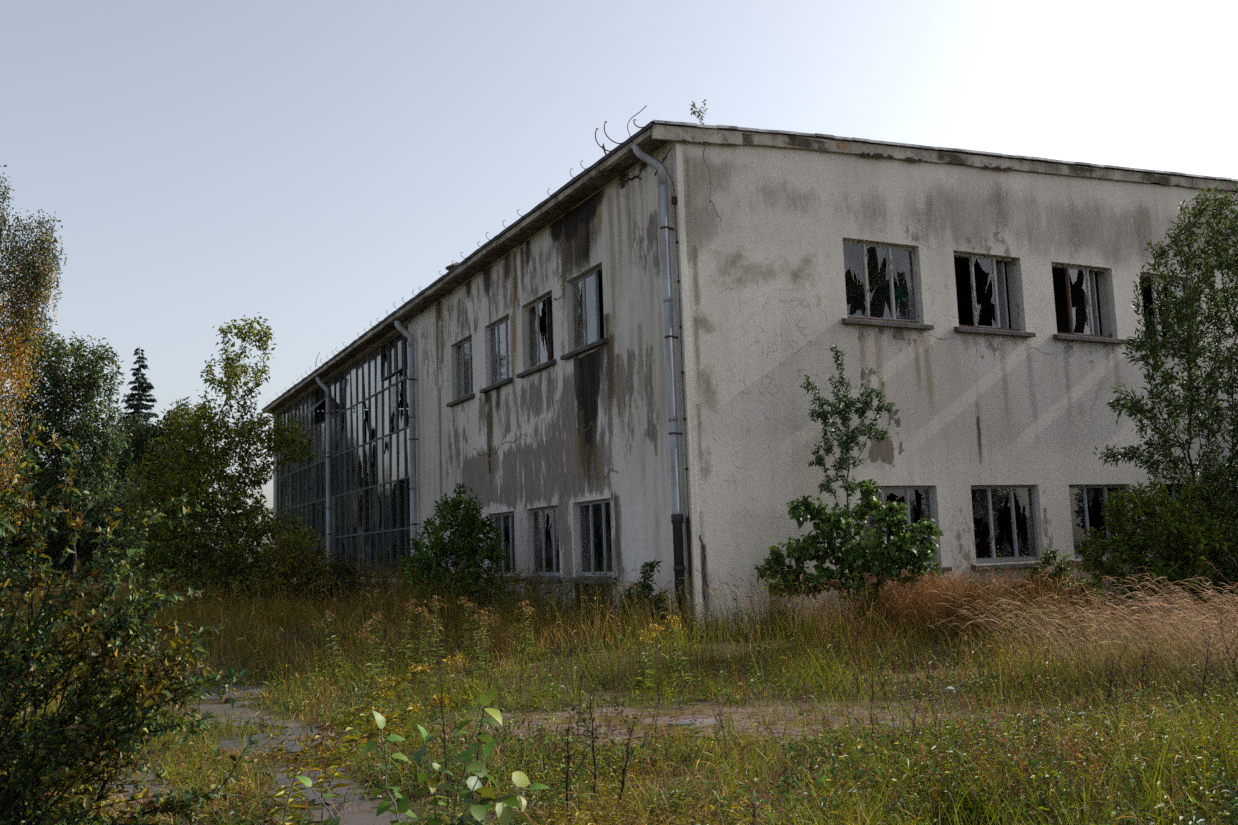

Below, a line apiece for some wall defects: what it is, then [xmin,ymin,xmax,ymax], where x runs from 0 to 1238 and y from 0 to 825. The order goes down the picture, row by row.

leakage [466,239,530,298]
leakage [549,189,604,299]
leakage [574,314,620,481]
crack [712,282,848,523]
peeling [846,369,885,391]
peeling [867,402,904,467]